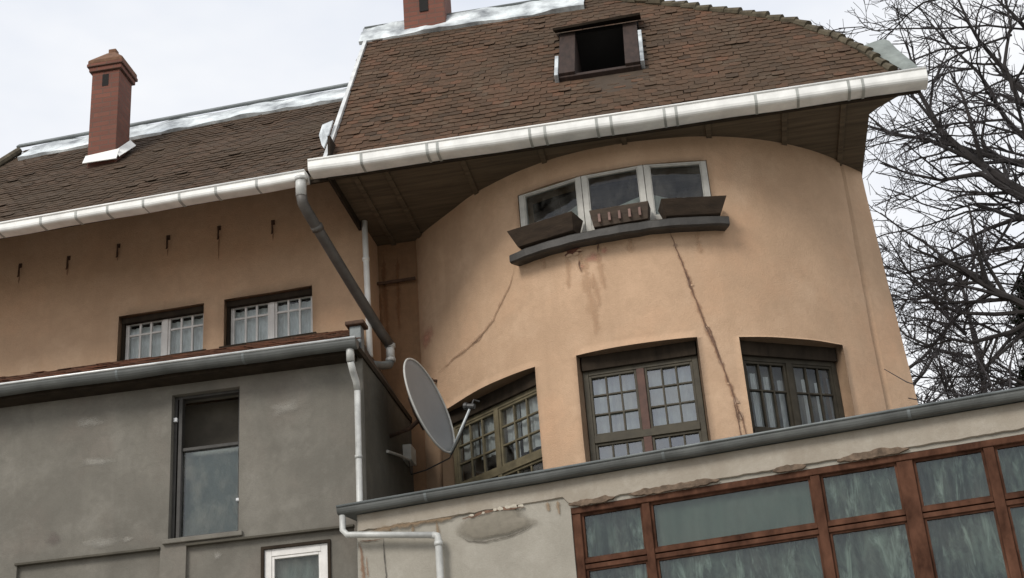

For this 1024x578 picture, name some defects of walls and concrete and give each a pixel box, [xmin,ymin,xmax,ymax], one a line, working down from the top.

crack [439,274,513,372]
crack [670,233,746,435]
peeling [628,478,719,496]
peeling [837,447,909,463]